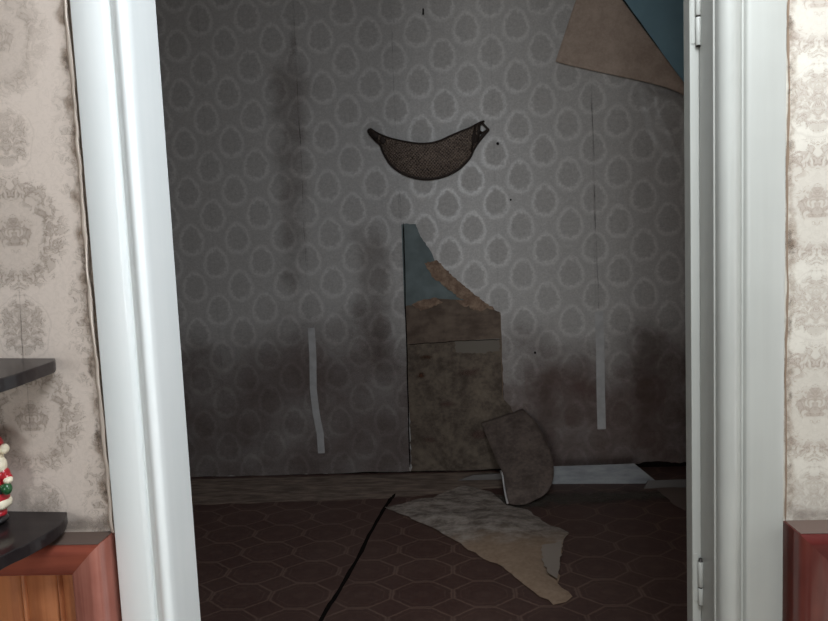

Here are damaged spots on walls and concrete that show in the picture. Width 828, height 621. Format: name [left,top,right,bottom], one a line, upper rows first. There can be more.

peeling [425,260,494,311]
leakage [508,355,686,466]